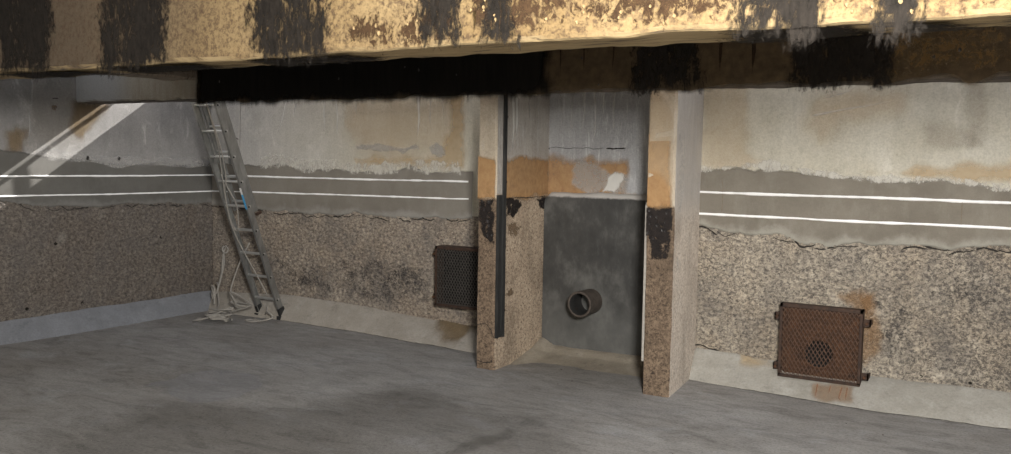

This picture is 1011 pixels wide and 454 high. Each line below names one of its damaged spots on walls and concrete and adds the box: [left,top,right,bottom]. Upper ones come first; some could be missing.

water stain [701,159,1011,192]